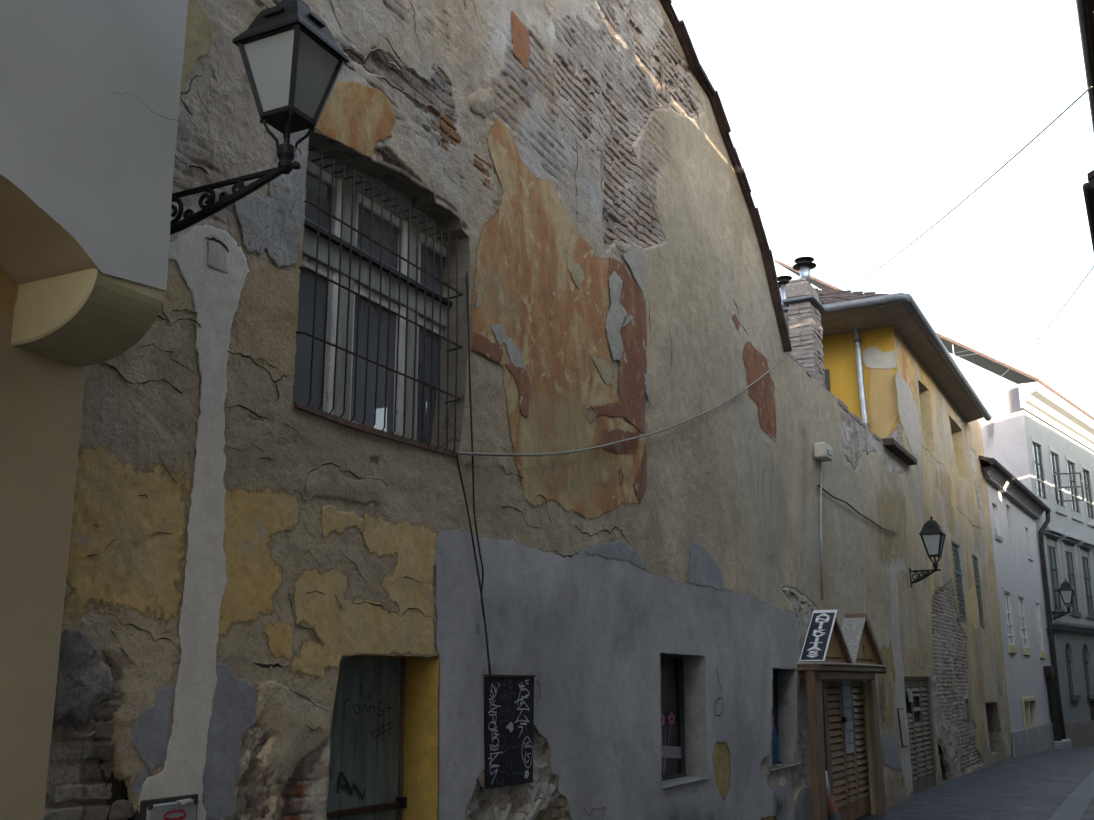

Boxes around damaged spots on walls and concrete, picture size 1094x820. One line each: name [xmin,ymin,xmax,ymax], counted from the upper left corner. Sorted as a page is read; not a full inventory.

peeling [235,48,461,268]
peeling [470,0,703,519]
crack [101,302,201,393]
crack [227,350,303,460]
peeling [743,341,777,441]
peeling [64,444,191,622]
crack [98,612,175,665]
peeling [219,487,438,680]
crack [285,461,430,644]
crack [495,459,630,558]
flaking render [44,665,151,820]
flaking render [220,725,332,820]